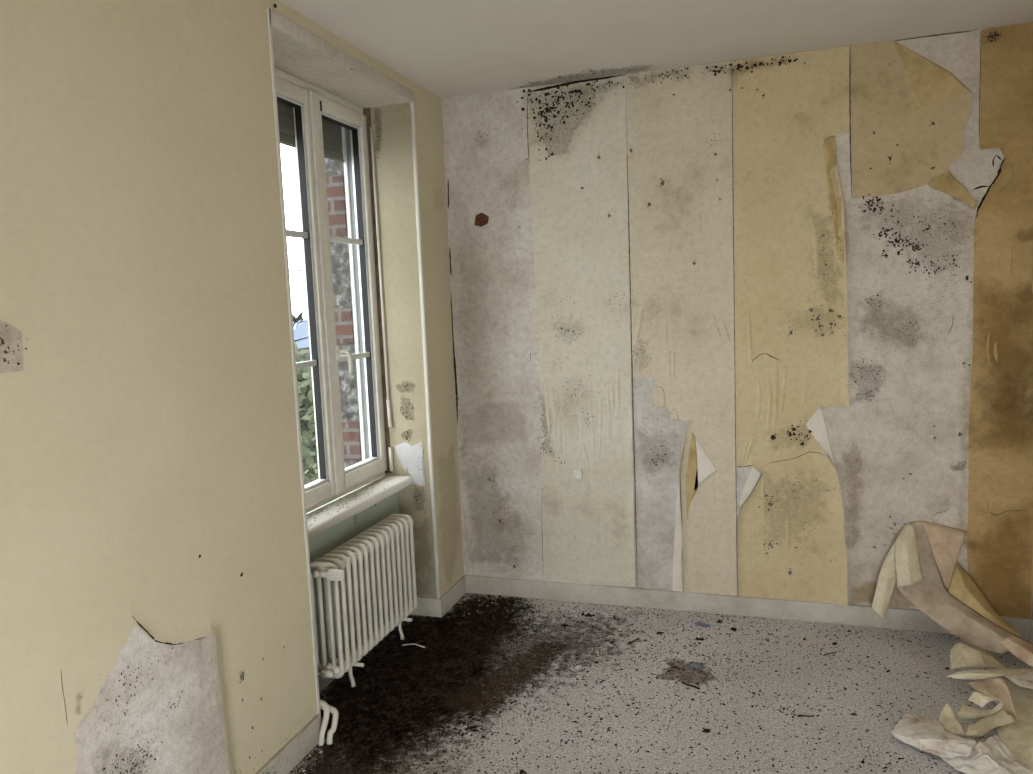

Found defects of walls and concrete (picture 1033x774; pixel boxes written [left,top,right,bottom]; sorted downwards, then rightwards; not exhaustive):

mould [517,66,689,161]
flaking render [822,29,1005,606]
leakage [859,194,973,342]
flaking render [631,372,688,591]
flaking render [736,462,763,525]
flaking render [74,625,230,774]